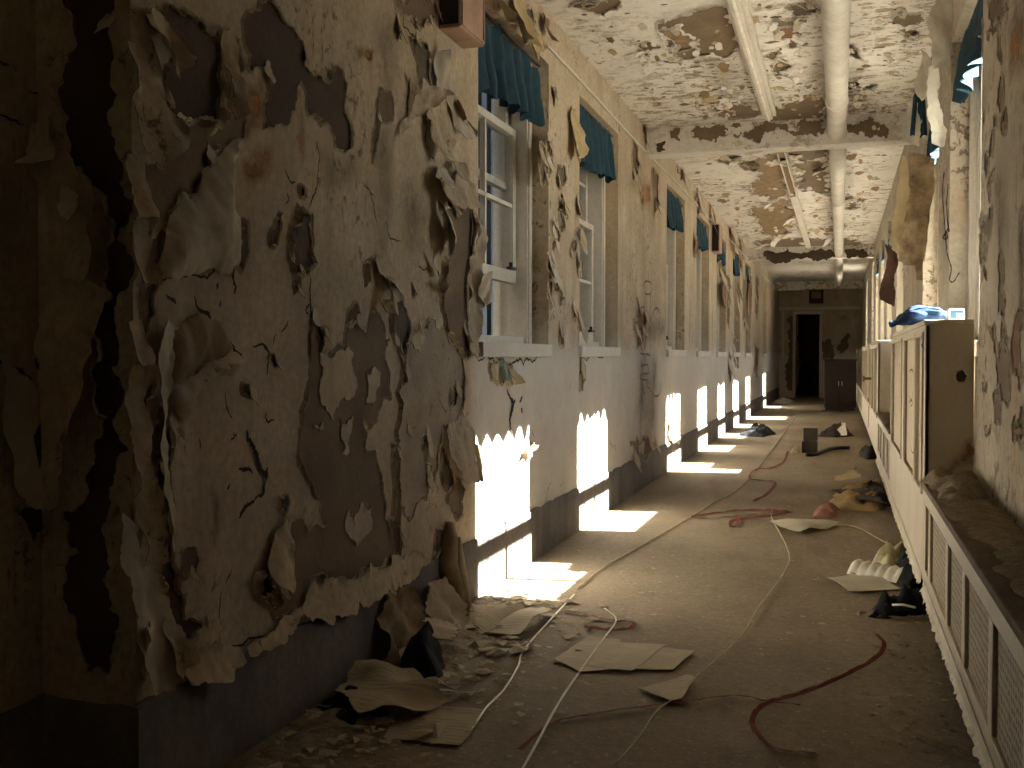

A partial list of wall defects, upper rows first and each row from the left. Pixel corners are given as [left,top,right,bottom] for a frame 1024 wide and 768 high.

flaking render [847,0,953,147]
crack [225,393,275,519]
peeling [1,0,526,696]
crack [473,354,537,445]
peeling [538,132,588,349]
peeling [567,0,891,393]
peeling [978,0,1024,451]